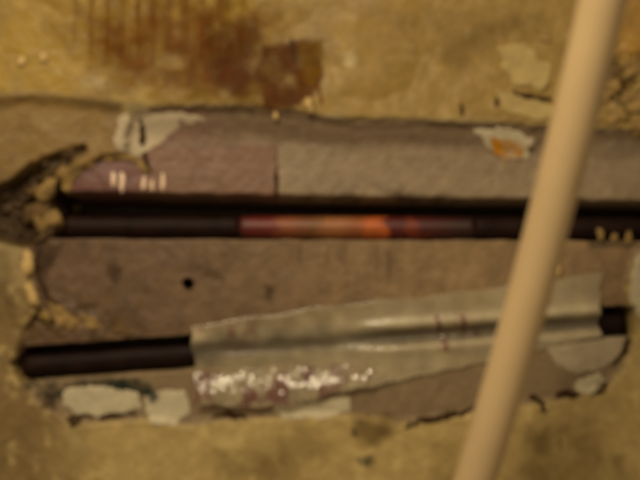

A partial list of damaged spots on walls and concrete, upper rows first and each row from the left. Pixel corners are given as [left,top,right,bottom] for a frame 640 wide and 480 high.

peeling [1,111,206,337]
spalling [596,228,633,242]
peeling [625,255,640,315]
peeling [547,336,627,394]
peeling [62,385,191,426]
peeling [273,396,351,420]